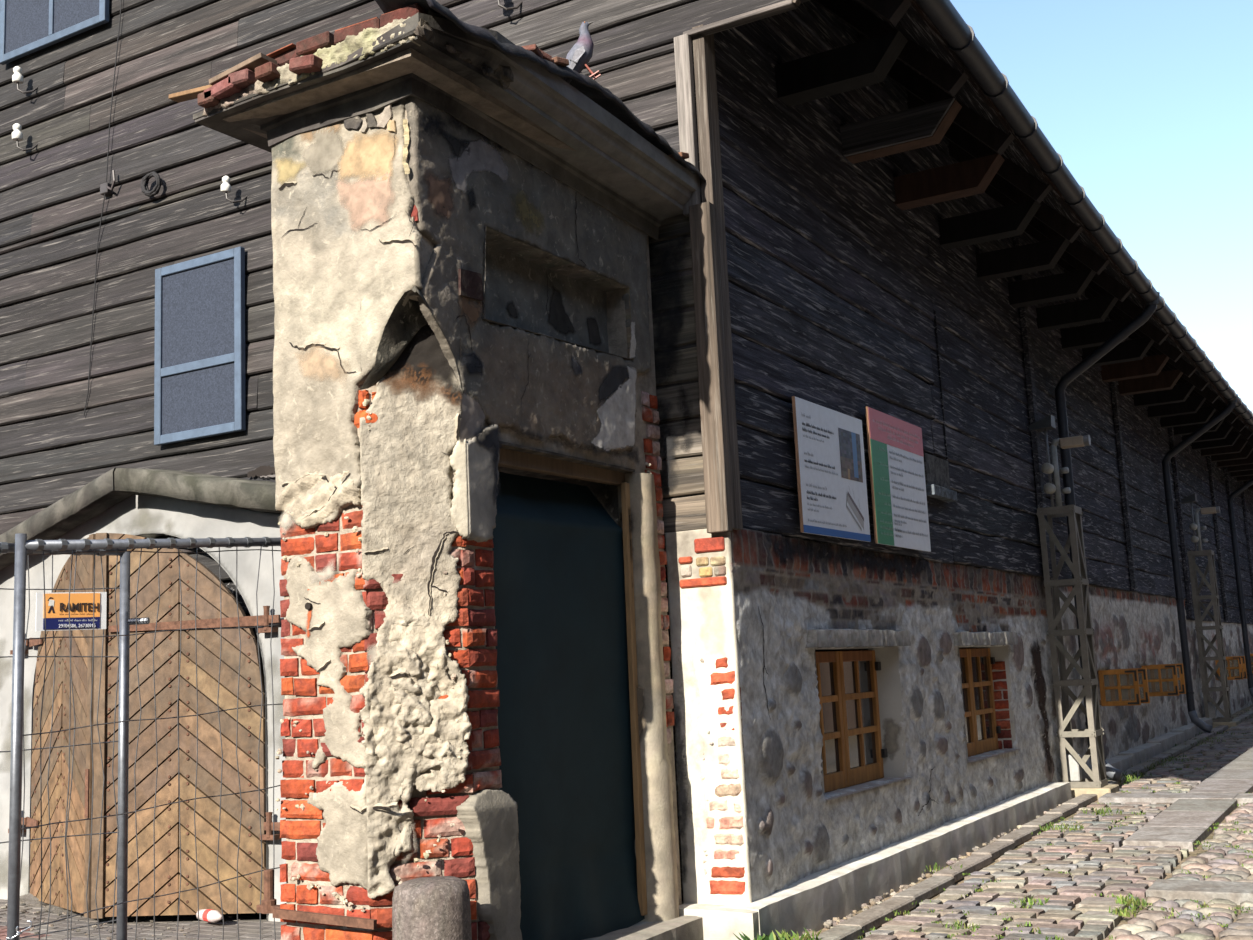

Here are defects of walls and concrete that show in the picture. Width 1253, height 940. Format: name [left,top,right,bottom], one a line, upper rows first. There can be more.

crack [279,169,341,237]
peeling [449,139,508,191]
crack [289,342,356,373]
crack [364,531,459,615]
flaking render [275,506,502,940]
flaking render [700,657,747,895]